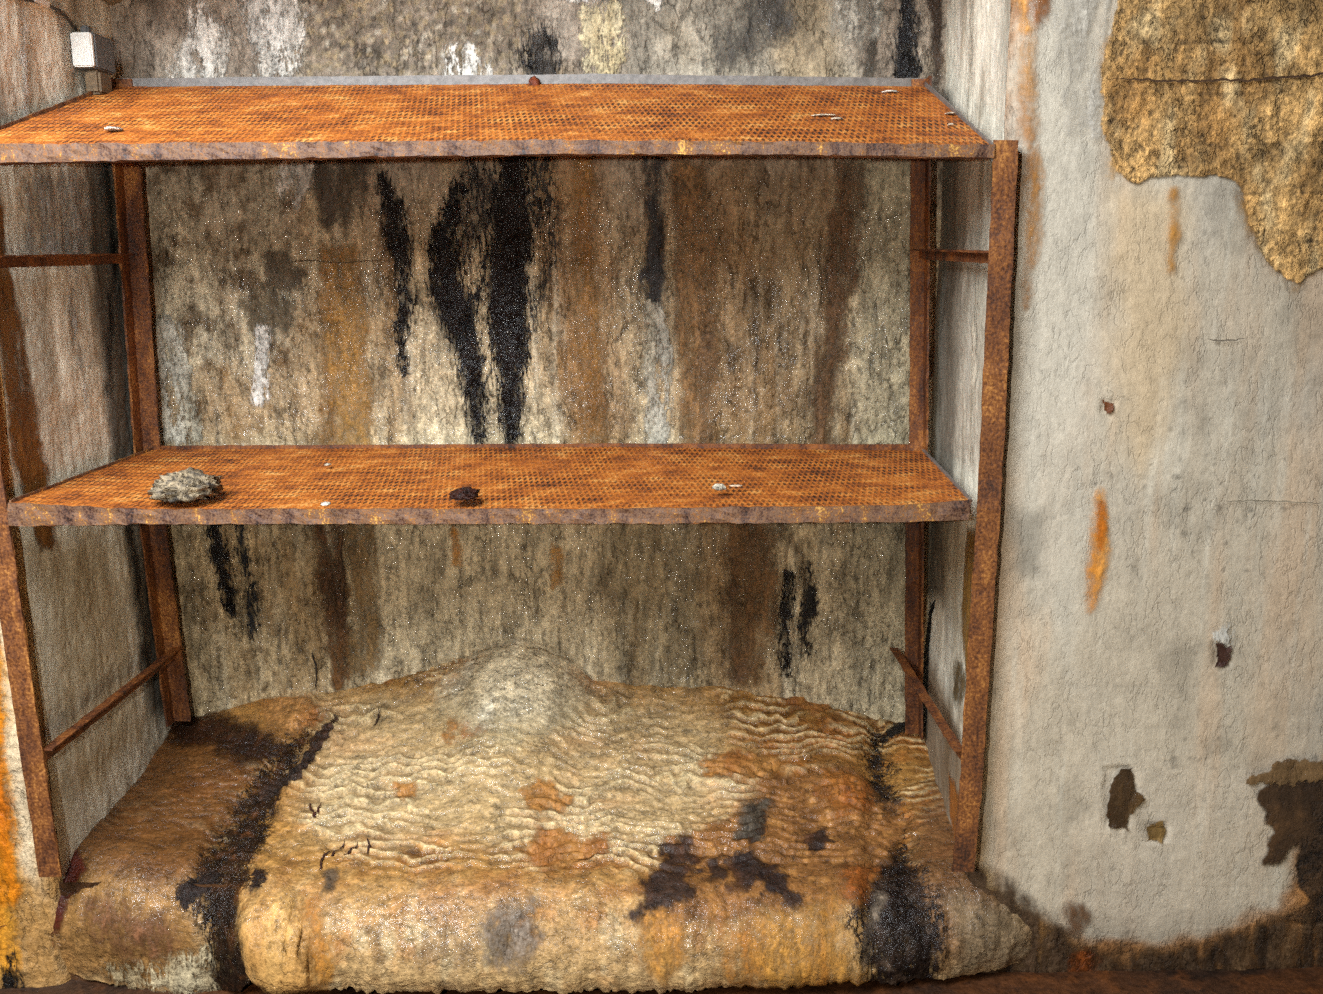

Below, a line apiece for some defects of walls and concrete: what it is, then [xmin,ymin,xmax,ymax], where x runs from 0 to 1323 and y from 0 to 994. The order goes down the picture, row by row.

damp [560,0,628,74]
damp [831,0,944,85]
peeling [1099,0,1323,283]
rust [0,203,50,494]
damp [276,156,560,444]
rust [33,525,56,552]
damp [204,524,260,640]
rust [1086,493,1109,608]
rust [0,652,20,977]
spalling [1106,767,1145,831]
damp [965,758,1323,973]
spalling [1146,821,1166,843]